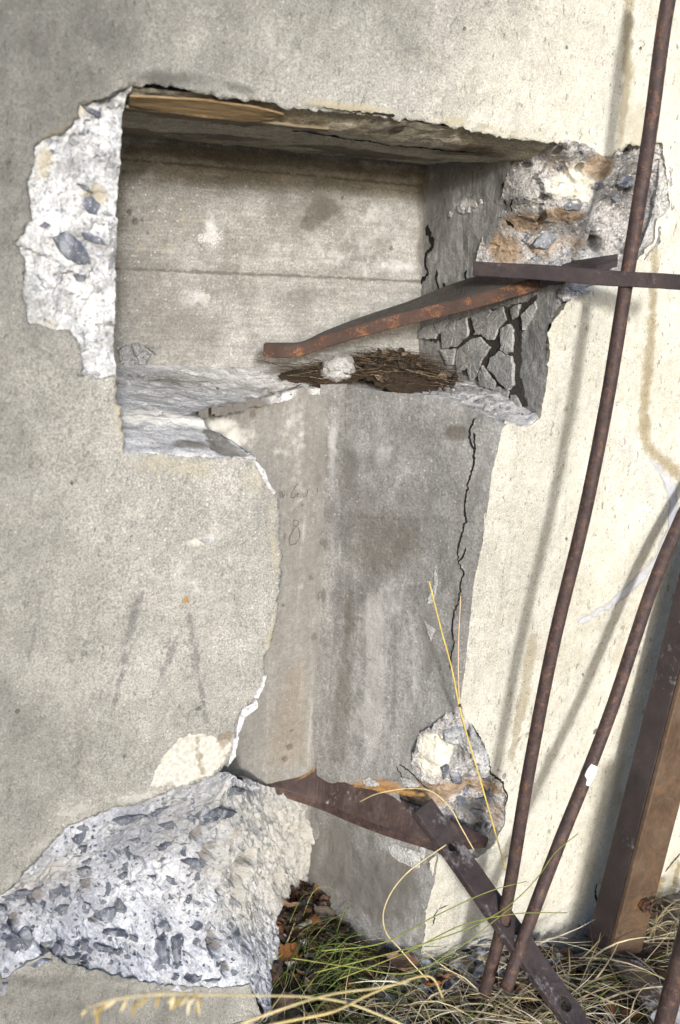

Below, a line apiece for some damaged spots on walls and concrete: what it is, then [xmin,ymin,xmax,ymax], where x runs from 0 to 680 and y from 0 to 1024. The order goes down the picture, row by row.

spalling [15,85,156,378]
crack [421,225,467,289]
spalling [476,139,640,271]
spalling [638,143,675,260]
crack [417,295,537,408]
crack [449,417,476,669]
leakage [579,465,679,623]
spalling [0,674,315,1022]
peeling [363,777,379,787]
rust [353,785,425,797]
peeling [389,844,456,869]
spalling [399,705,508,841]